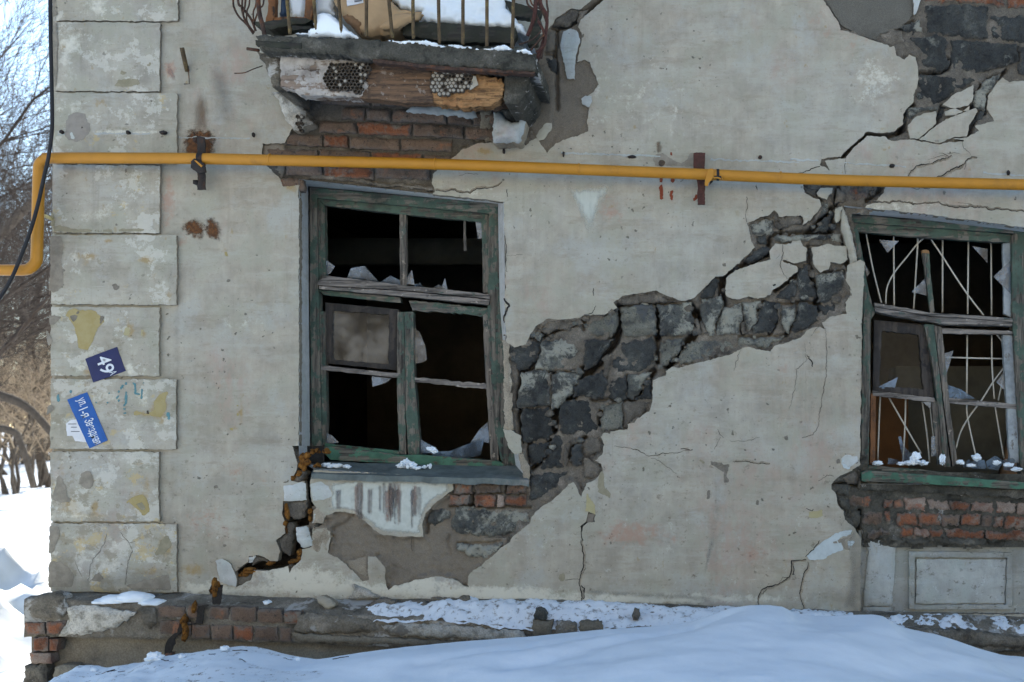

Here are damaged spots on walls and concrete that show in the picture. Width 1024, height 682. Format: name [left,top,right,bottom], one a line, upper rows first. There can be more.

spalling [524,0,603,152]
spalling [820,0,1024,170]
rust [183,112,215,153]
spalling [263,100,508,194]
rust [653,143,698,200]
crack [873,142,1024,212]
rust [182,218,219,240]
spalling [309,185,884,589]
crack [164,446,332,656]
crack [758,540,820,609]
spalling [807,455,1024,560]